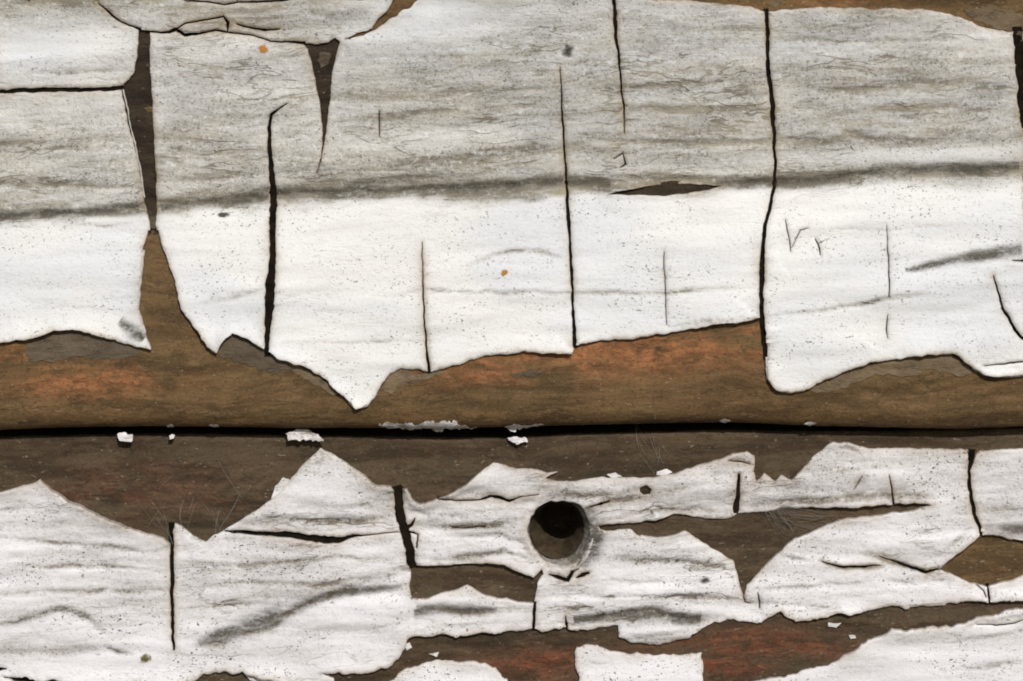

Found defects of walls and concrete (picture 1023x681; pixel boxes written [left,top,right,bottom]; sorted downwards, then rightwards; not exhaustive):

crack [0,85,125,93]
crack [98,0,306,45]
crack [1012,26,1023,128]
crack [264,103,288,357]
peeling [0,0,1023,432]
crack [560,71,577,348]
crack [759,8,821,360]
crack [984,260,1023,366]
crack [168,522,176,650]
crack [224,484,419,569]
peeling [0,429,1023,681]
crack [967,449,983,536]